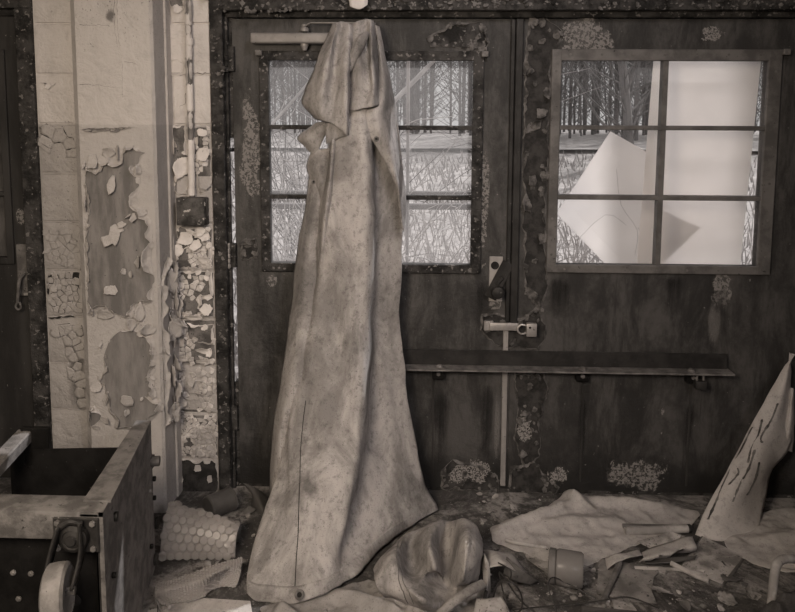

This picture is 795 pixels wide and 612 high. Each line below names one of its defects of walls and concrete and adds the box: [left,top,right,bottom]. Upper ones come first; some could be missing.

peeling [169,0,192,22]
peeling [209,0,530,105]
rust [426,20,490,51]
peeling [81,126,133,134]
peeling [172,115,212,197]
rust [480,18,566,351]
peeling [81,144,219,492]